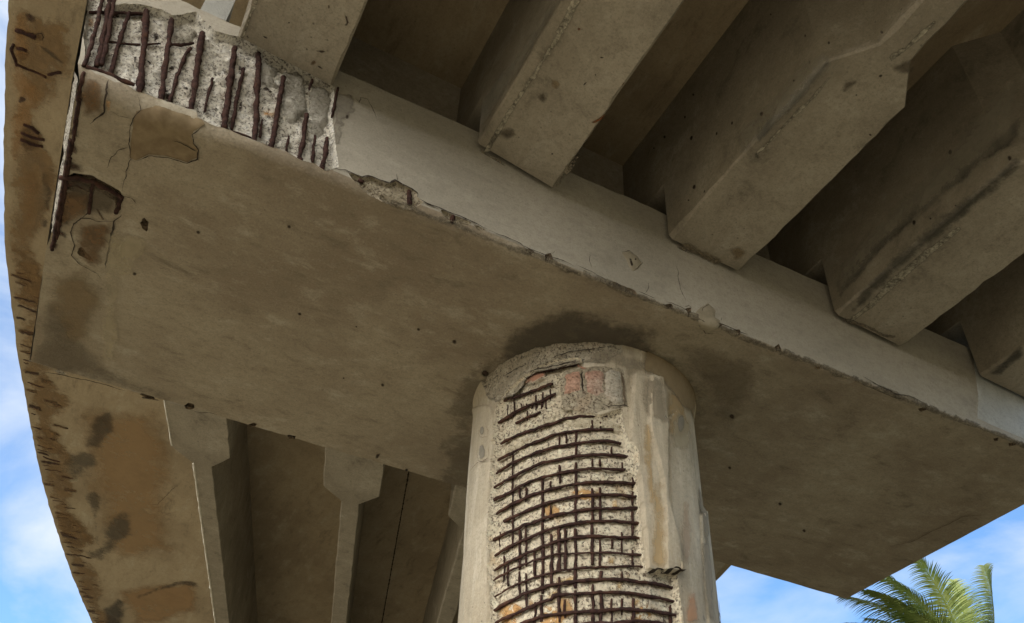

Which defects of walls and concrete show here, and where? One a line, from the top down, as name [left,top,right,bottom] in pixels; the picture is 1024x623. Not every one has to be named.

corrosion [50,71,100,251]
spalling [9,0,705,322]
damp [507,320,647,357]
spalling [718,324,1024,448]
damp [88,400,173,553]
damp [123,582,195,622]
damp [192,463,216,623]
spalling [481,342,687,623]
corrosion [653,495,664,565]